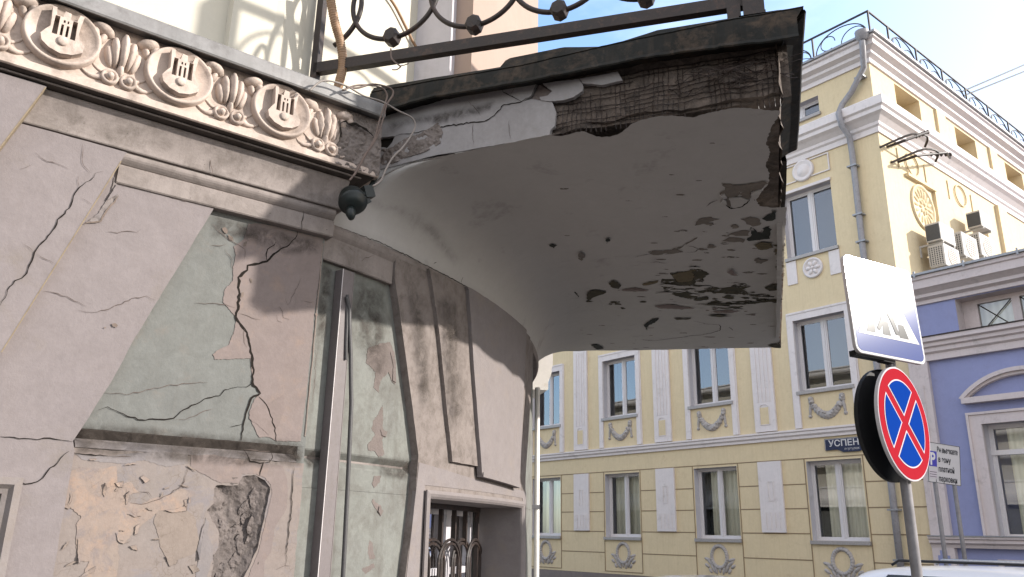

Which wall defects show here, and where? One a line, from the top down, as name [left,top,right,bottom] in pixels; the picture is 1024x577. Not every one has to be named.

spalling [334,110,443,176]
crack [339,88,535,144]
peeling [532,45,791,264]
crack [0,145,154,312]
peeling [664,288,783,312]
crack [99,214,322,569]
peeling [366,342,396,393]
crack [0,436,130,485]
peeling [367,405,388,457]
peeling [63,452,288,577]